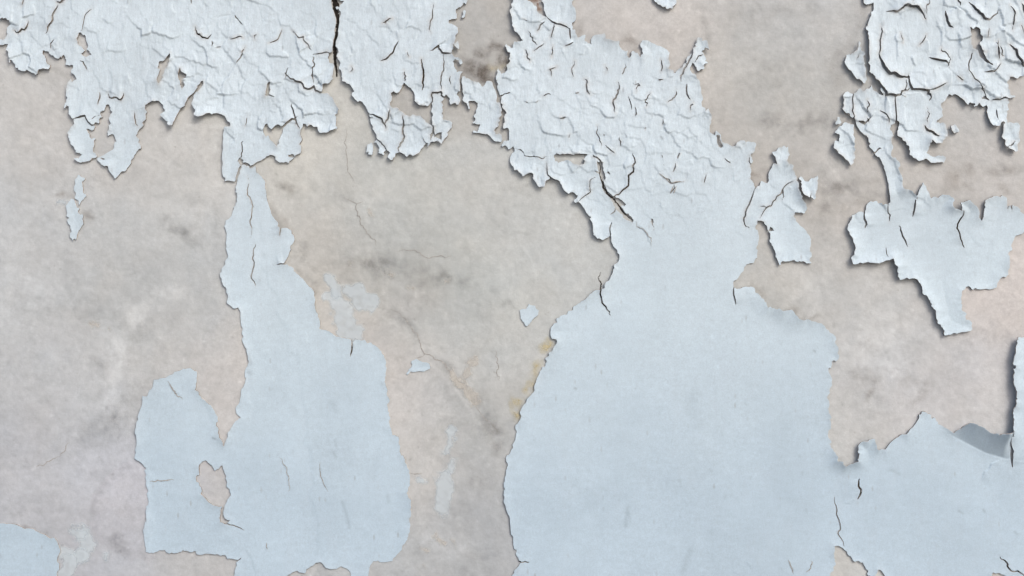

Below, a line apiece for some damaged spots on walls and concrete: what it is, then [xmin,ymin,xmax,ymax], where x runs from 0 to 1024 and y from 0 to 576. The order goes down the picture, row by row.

peeling [0,0,494,576]
crack [332,0,340,77]
peeling [336,0,1024,576]